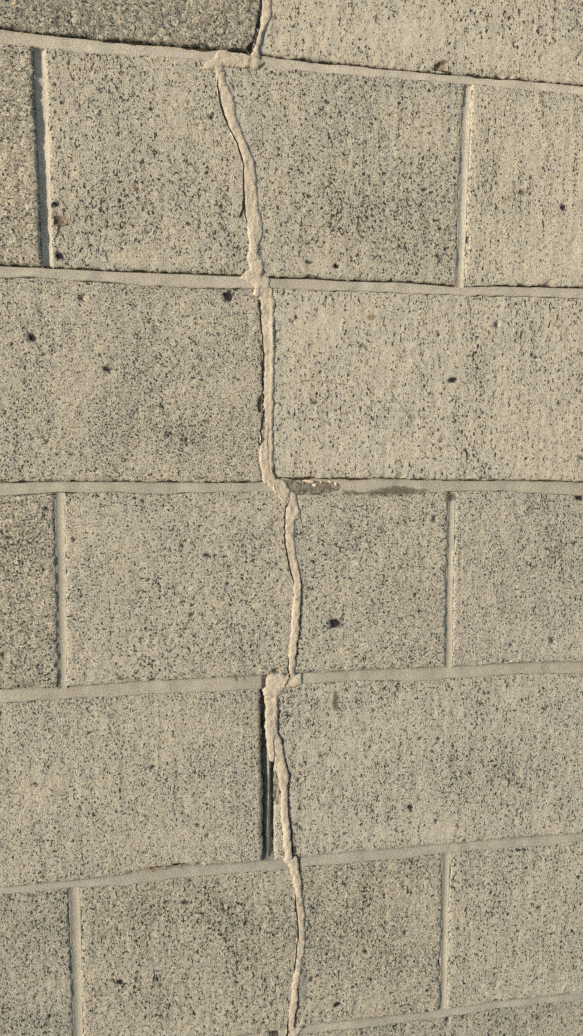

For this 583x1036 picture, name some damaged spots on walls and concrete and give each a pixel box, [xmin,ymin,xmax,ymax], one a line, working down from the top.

crack [203,0,306,1036]